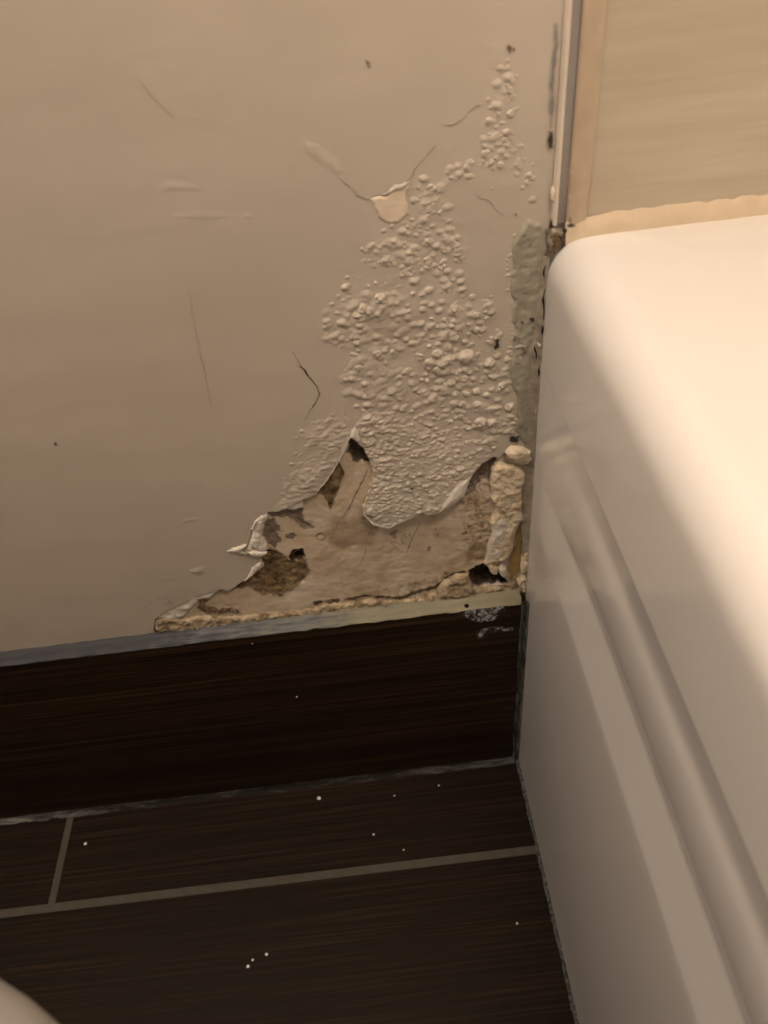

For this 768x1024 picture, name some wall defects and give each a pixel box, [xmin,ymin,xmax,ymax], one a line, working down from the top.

spalling [371,181,410,224]
crack [294,354,320,420]
flaking render [154,406,532,633]